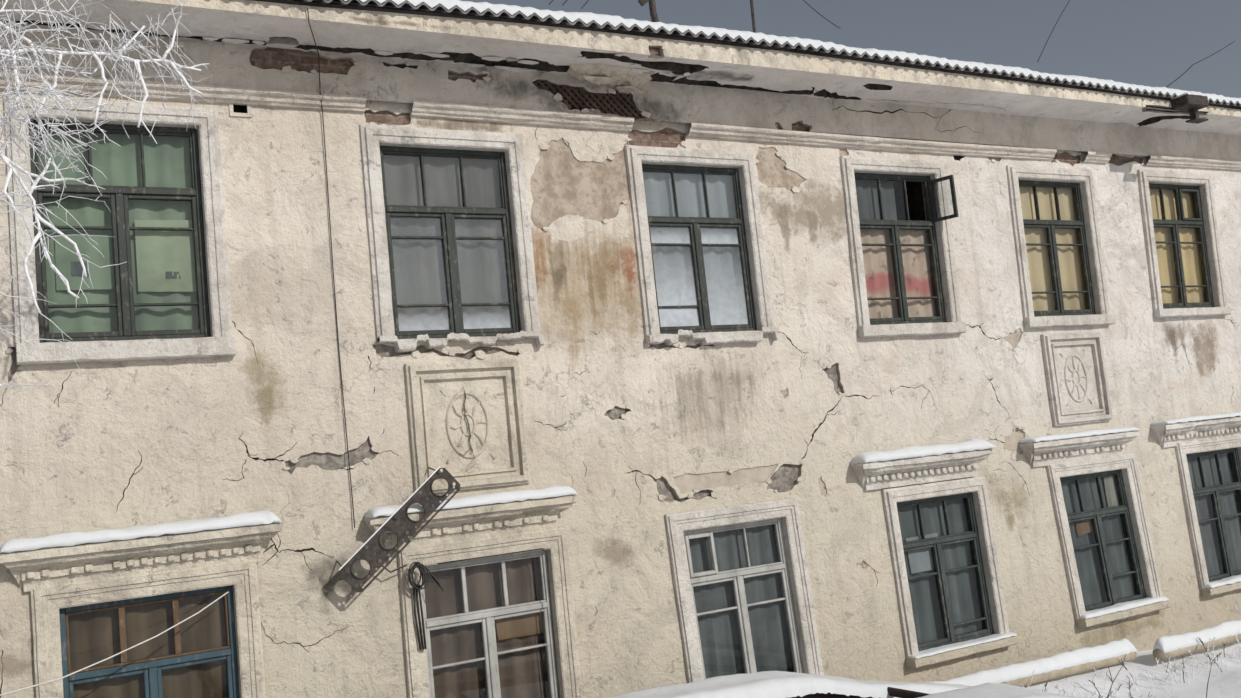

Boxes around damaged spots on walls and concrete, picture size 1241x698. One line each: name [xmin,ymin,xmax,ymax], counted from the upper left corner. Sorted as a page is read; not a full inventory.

spalling [249,43,359,75]
spalling [364,107,411,125]
peeling [531,112,687,231]
leakage [762,185,845,248]
leakage [1192,325,1215,373]
crack [459,387,475,460]
crack [802,385,937,459]
crack [223,433,297,481]
spalling [282,436,379,474]
peeling [650,461,827,502]
crack [261,533,332,570]
crack [261,622,345,653]